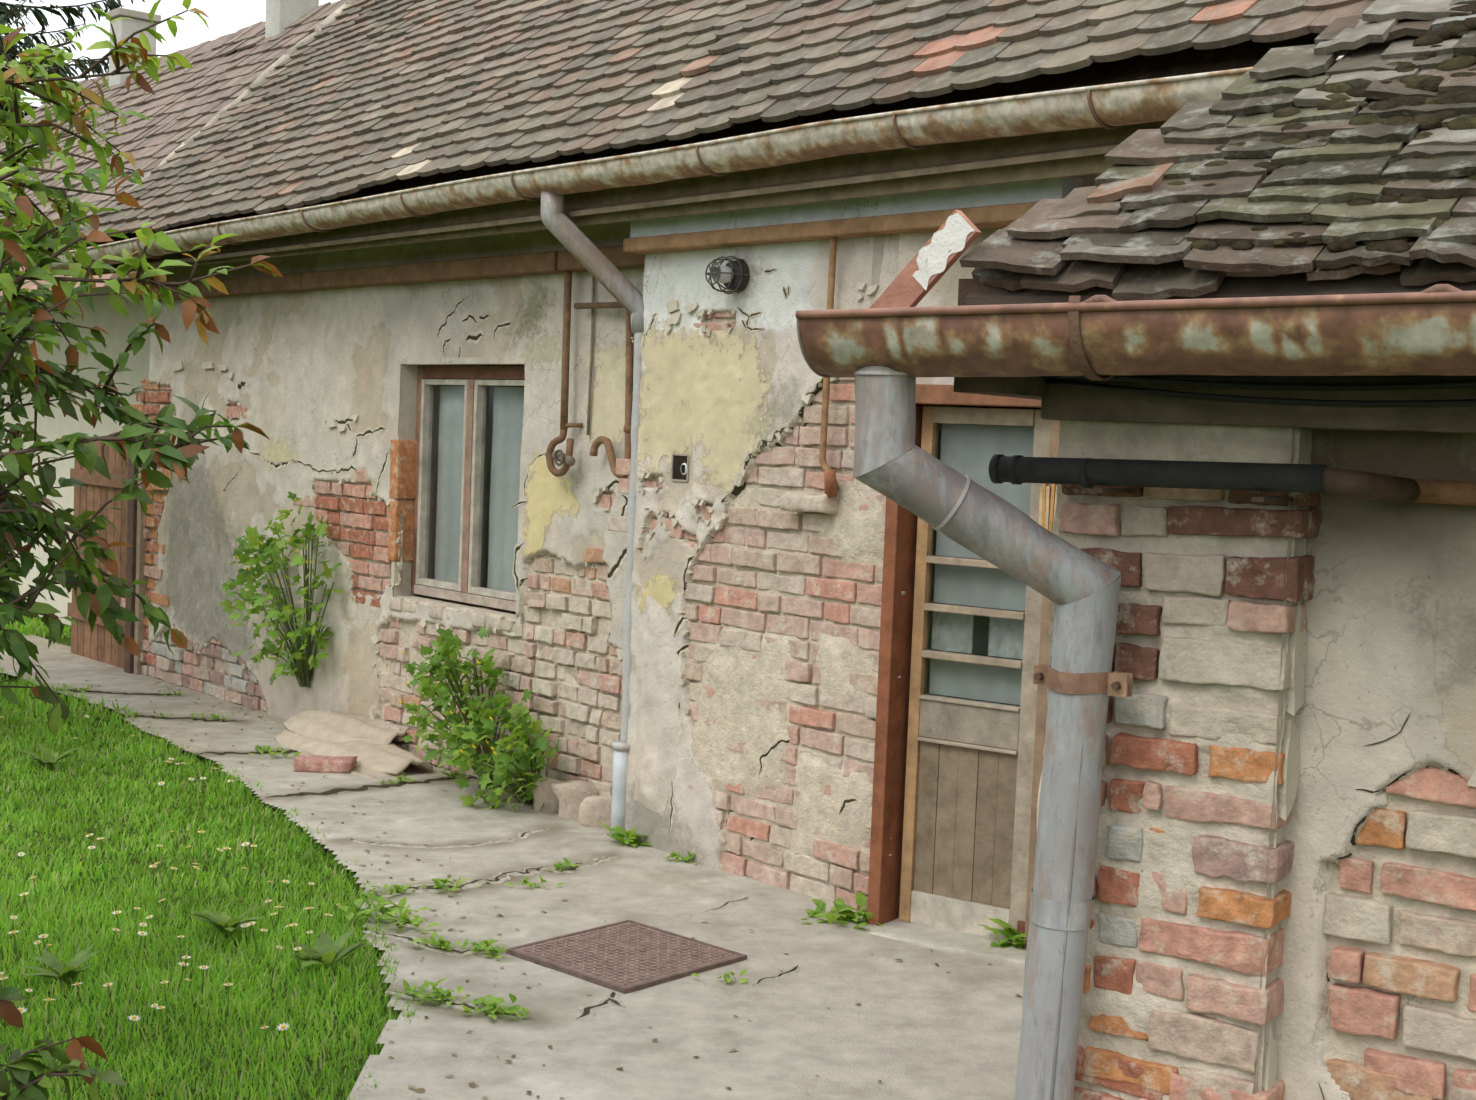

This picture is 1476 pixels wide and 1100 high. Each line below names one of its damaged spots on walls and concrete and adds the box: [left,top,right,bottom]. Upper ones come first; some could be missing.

flaking render [130,360,184,441]
crack [436,298,512,358]
flaking render [121,464,268,713]
flaking render [293,300,886,912]
flaking render [1306,754,1476,1100]